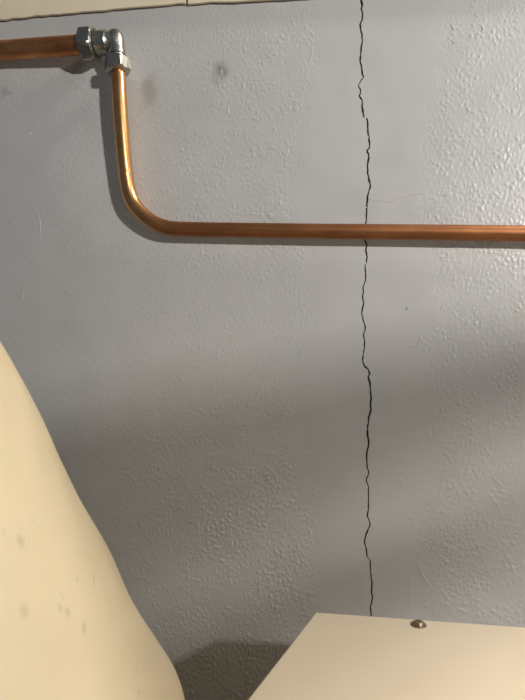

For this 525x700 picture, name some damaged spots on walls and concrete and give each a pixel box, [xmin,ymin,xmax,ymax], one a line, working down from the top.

crack [358,0,415,617]